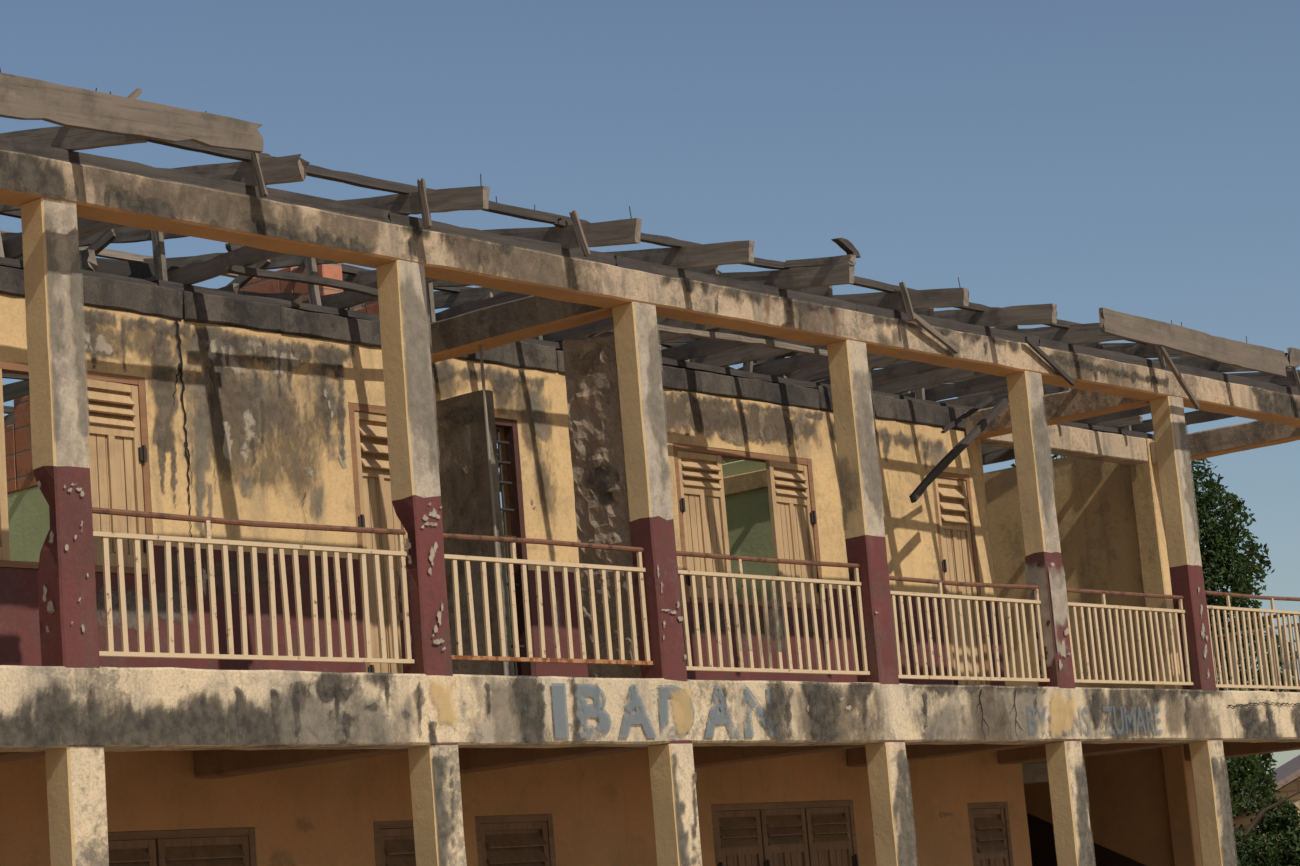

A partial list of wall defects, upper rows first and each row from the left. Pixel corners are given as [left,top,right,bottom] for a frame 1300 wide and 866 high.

crack [173,320,220,545]
leakage [45,214,355,629]
peeling [223,411,259,462]
leakage [648,328,836,479]
peeling [421,503,443,528]
peeling [396,538,412,621]
peeling [428,542,438,575]
peeling [432,601,446,650]
leakage [763,681,882,741]
leakage [913,684,1046,741]
leakage [1237,700,1300,739]
leakage [0,672,455,866]